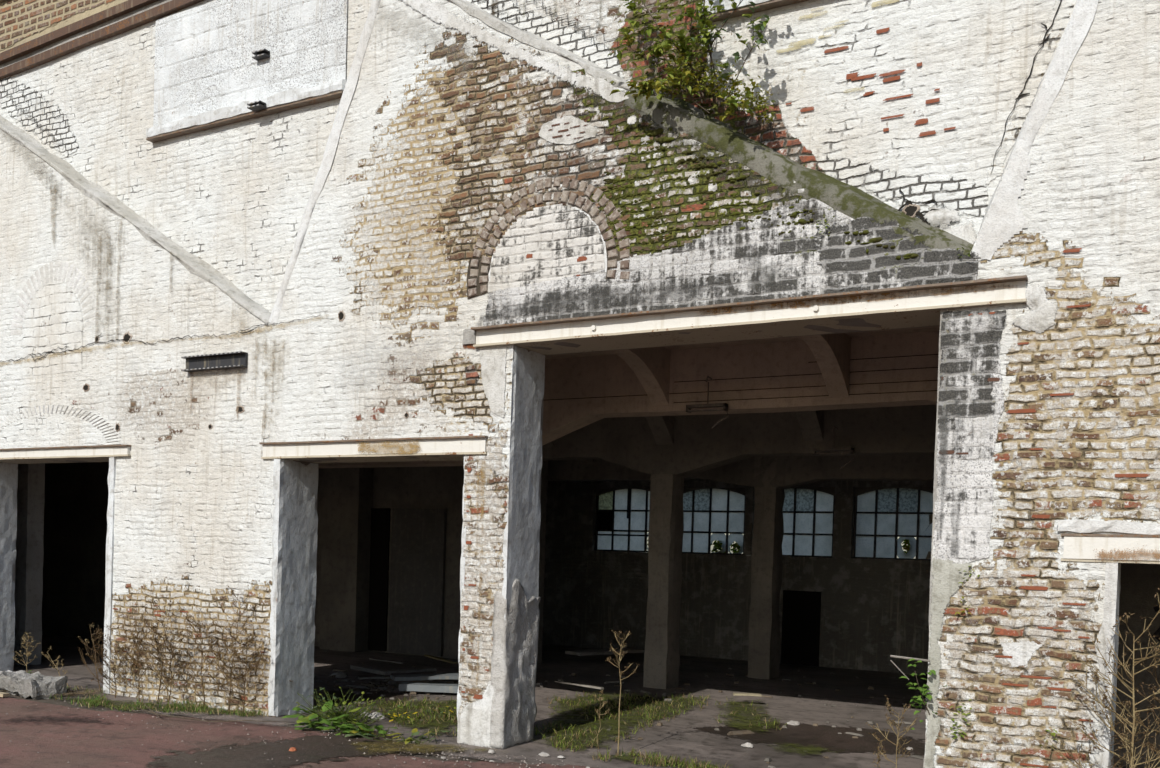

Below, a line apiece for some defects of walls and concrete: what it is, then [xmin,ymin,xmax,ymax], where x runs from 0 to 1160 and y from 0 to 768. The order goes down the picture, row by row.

peeling [331,22,658,347]
peeling [559,0,825,173]
water stain [567,80,978,292]
peeling [776,20,849,53]
peeling [846,62,922,101]
peeling [914,118,955,137]
crack [3,315,319,362]
water stain [480,279,731,324]
water stain [938,309,1007,485]
peeling [409,352,541,749]
peeling [925,230,1160,768]
peeling [110,575,277,717]